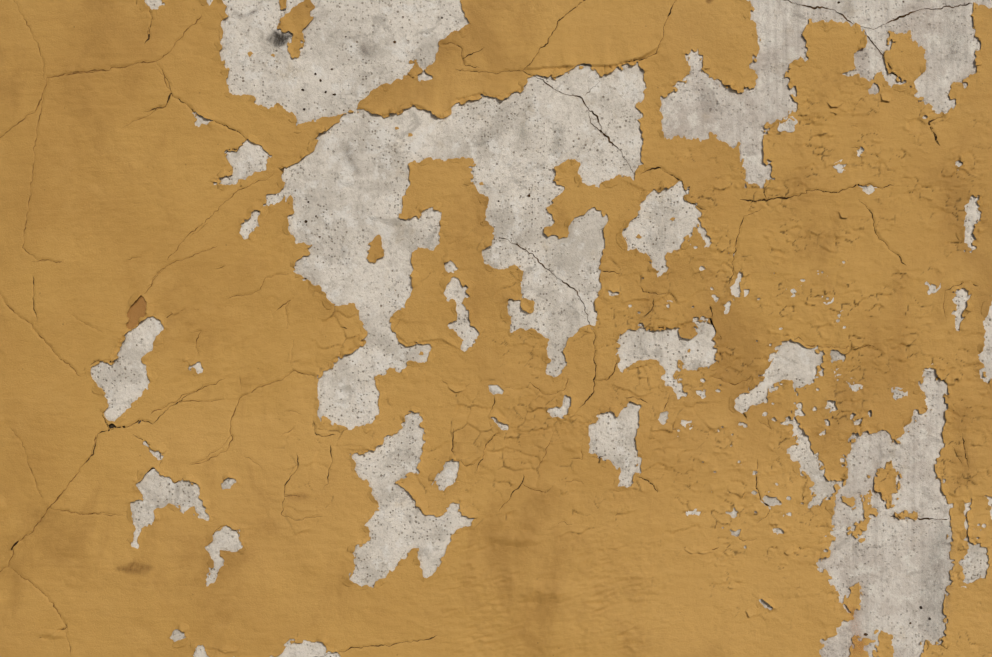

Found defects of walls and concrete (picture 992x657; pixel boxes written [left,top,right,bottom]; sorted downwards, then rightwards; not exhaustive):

peeling [136,0,165,12]
crack [784,0,972,83]
peeling [193,110,217,130]
crack [449,0,706,210]
crack [0,3,241,376]
peeling [84,292,167,423]
peeling [199,0,992,657]
crack [0,370,322,655]
peeling [126,441,211,549]
crack [451,429,504,471]
crack [500,438,552,509]
peeling [170,621,219,657]